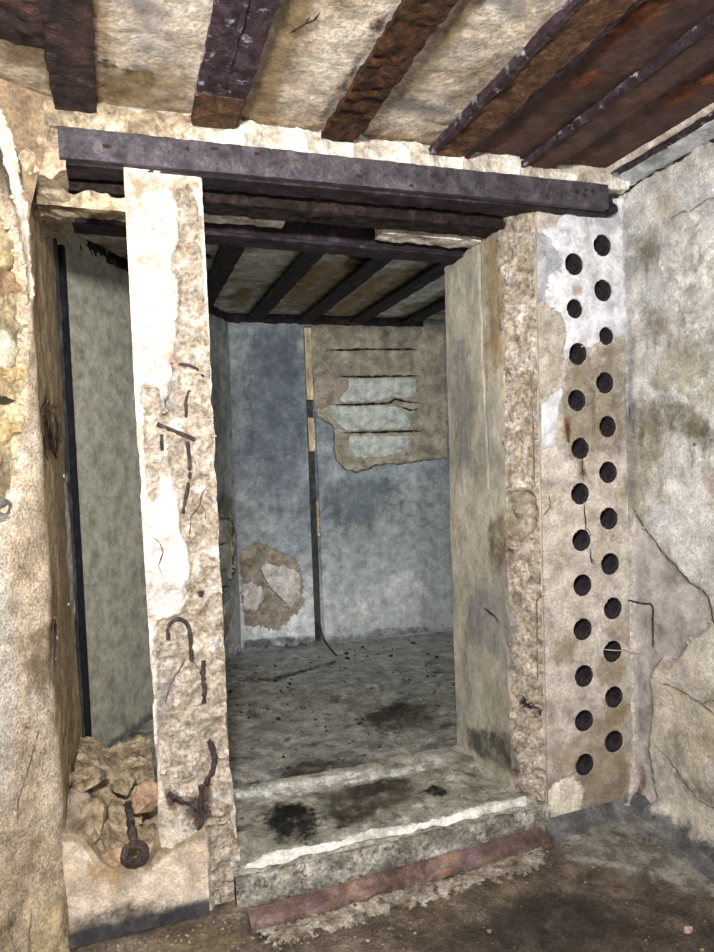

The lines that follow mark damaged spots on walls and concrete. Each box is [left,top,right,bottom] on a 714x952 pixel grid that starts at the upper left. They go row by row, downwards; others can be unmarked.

flaking render [0,109,35,523]
spalling [140,183,626,905]
peeling [624,512,713,806]
crack [657,680,714,716]
rust [166,784,211,826]
leakage [263,779,410,845]
leakage [423,785,448,797]